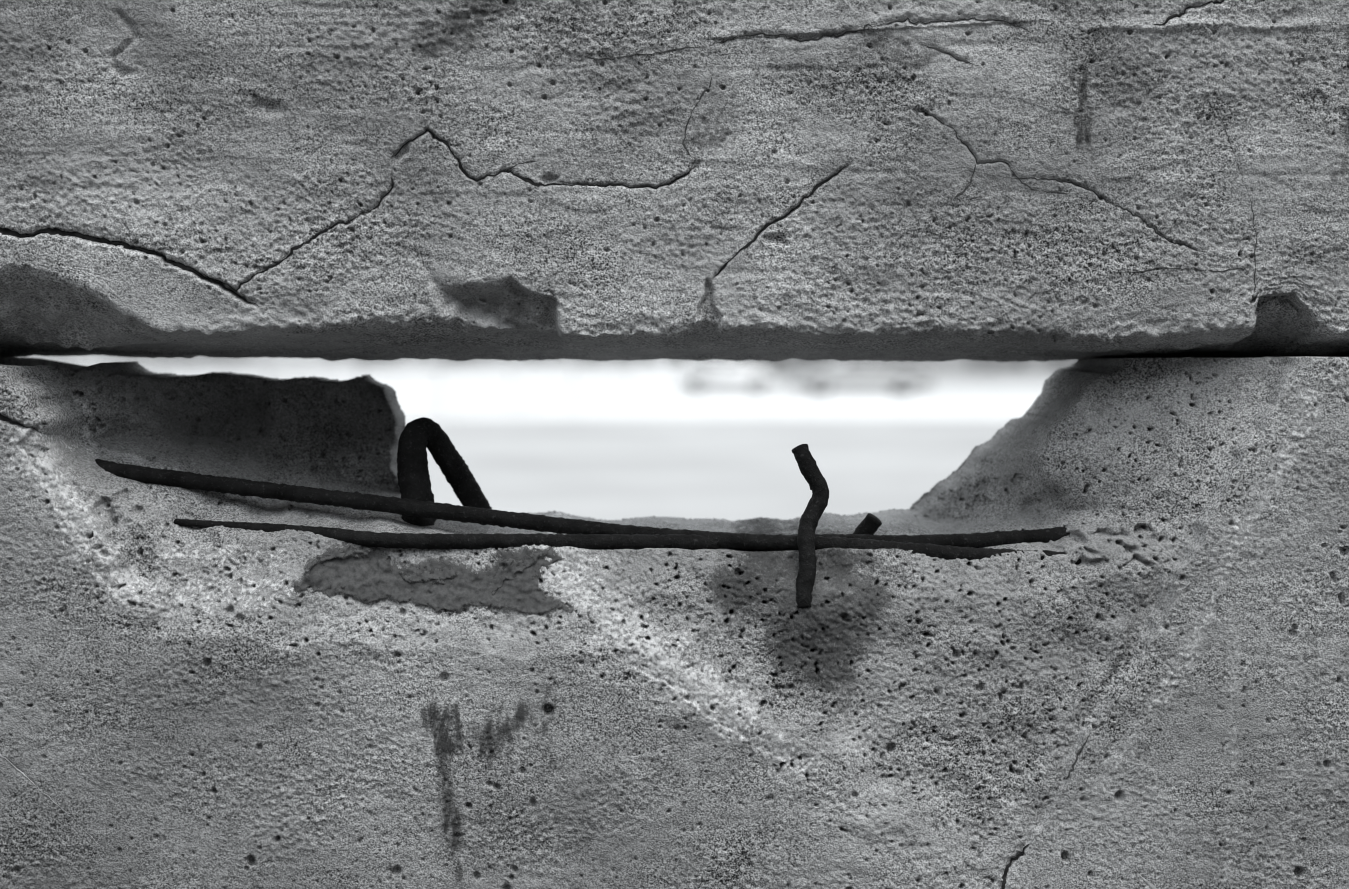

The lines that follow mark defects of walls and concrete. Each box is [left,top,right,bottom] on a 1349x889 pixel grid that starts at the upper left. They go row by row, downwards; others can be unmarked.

crack [0,17,1035,307]
crack [903,105,1257,313]
spalling [406,250,565,334]
spalling [1251,291,1327,333]
crack [0,413,45,434]
spalling [0,271,1294,889]
water stain [422,693,554,854]
crack [1066,734,1090,779]
crack [1001,844,1029,889]